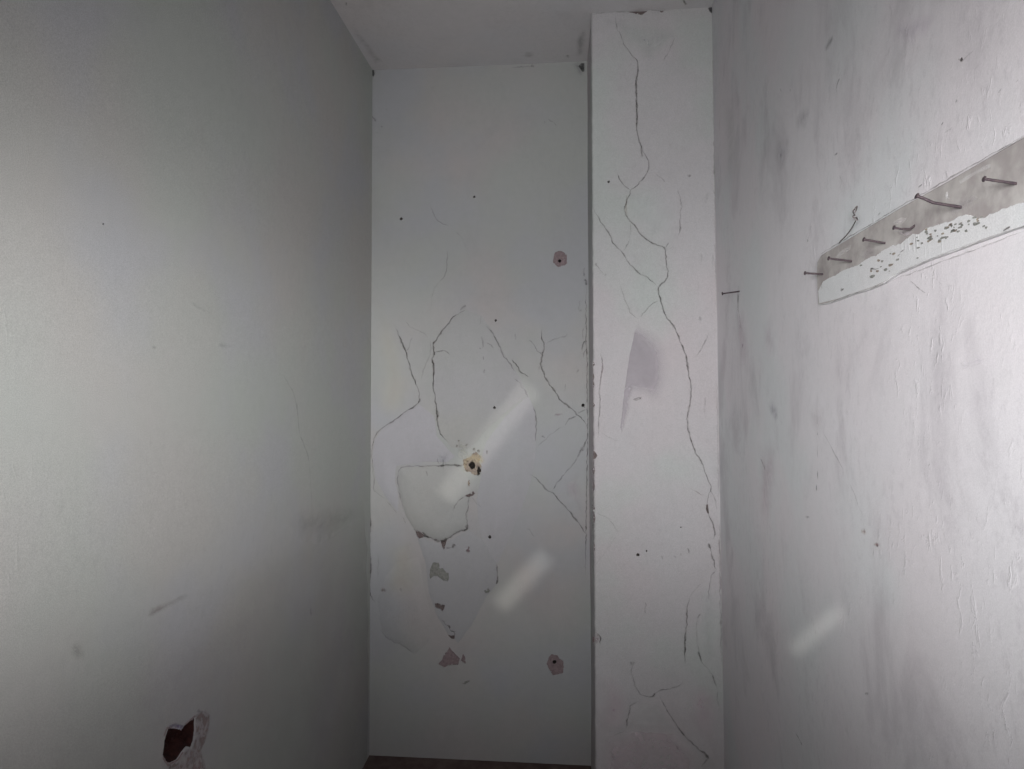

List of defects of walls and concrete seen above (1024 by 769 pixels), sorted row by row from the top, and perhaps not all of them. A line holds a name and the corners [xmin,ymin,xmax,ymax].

peeling [910,216,987,259]
spalling [553,251,567,267]
spalling [458,440,482,497]
spalling [430,562,449,581]
spalling [437,635,466,667]
spalling [547,654,564,675]
spalling [163,713,209,769]